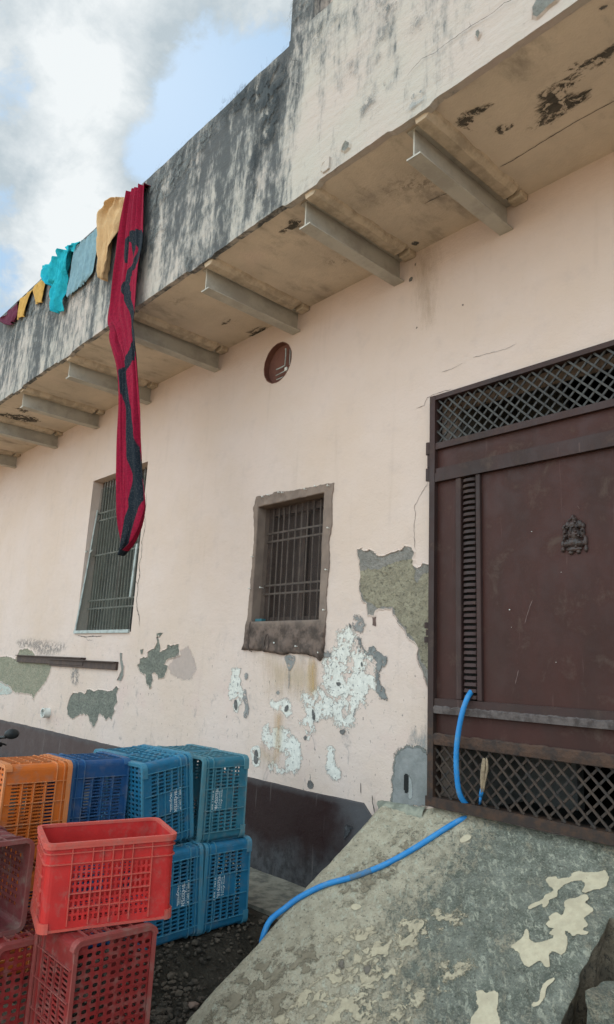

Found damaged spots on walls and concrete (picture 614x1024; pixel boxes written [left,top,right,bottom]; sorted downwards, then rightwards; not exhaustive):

damp [225,58,285,197]
damp [10,292,53,341]
spalling [0,647,52,700]
spalling [67,632,181,728]
spalling [250,544,429,781]
peeling [511,870,609,1007]
peeling [470,990,500,1024]